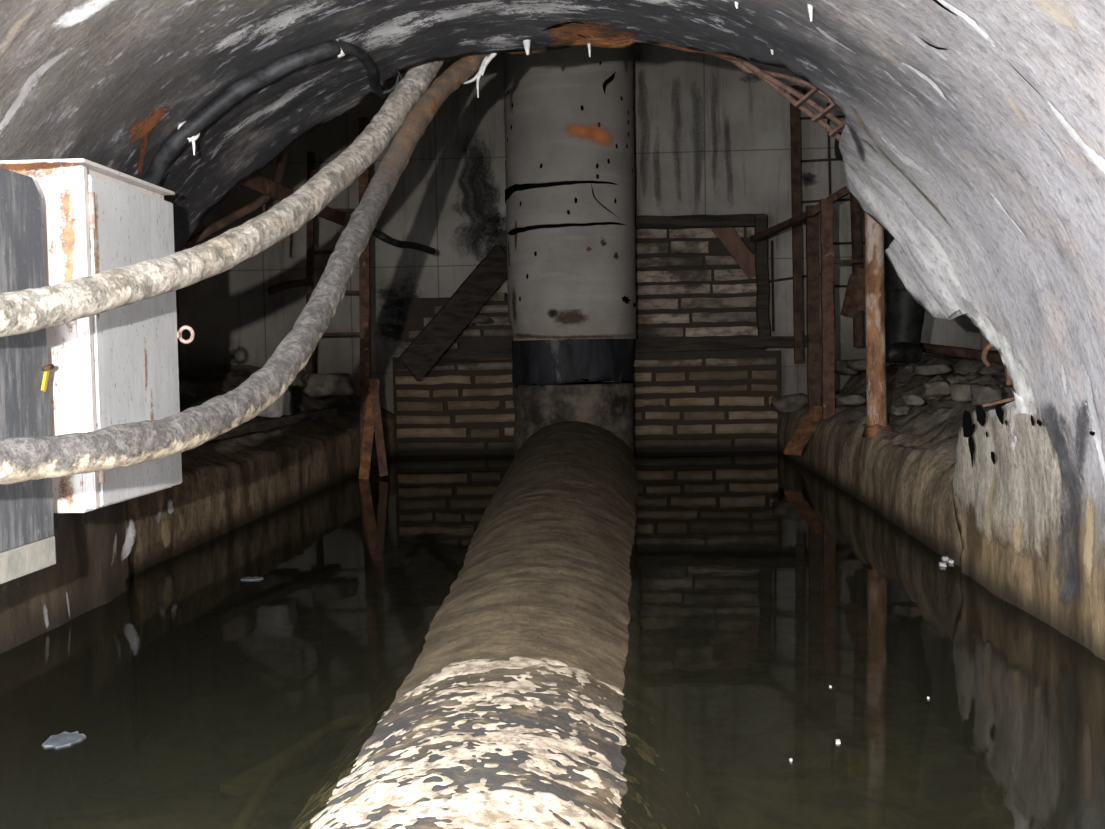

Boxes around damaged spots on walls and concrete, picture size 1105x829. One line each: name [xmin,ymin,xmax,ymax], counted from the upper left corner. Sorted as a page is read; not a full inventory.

corrosion [509,20,637,54]
damp [815,26,856,54]
corrosion [127,106,168,174]
corrosion [569,125,610,144]
damp [853,109,946,220]
damp [457,140,507,258]
crack [505,179,625,235]
damp [378,278,417,345]
spalling [981,342,1012,386]
damp [962,298,1105,603]